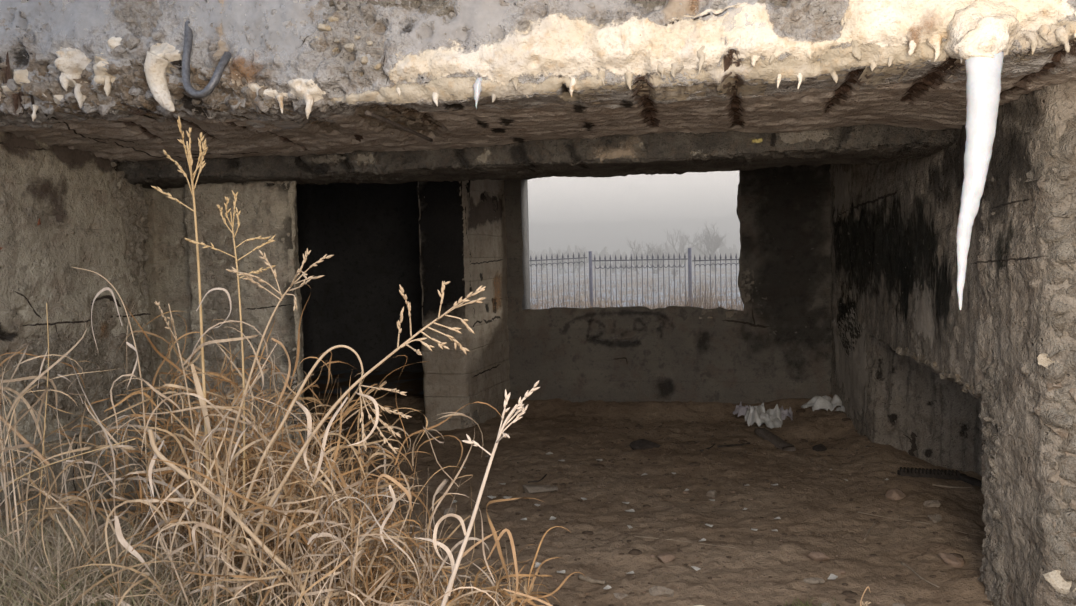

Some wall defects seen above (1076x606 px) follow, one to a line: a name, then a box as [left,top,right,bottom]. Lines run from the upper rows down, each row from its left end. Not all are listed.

water stain [330,0,975,127]
water stain [992,0,1076,98]
water stain [5,66,39,116]
water stain [119,102,213,138]
water stain [340,154,375,170]
water stain [600,143,643,161]
water stain [468,192,503,230]
water stain [982,103,1030,277]
water stain [831,130,966,429]
crack [15,291,151,334]
crack [245,303,287,311]